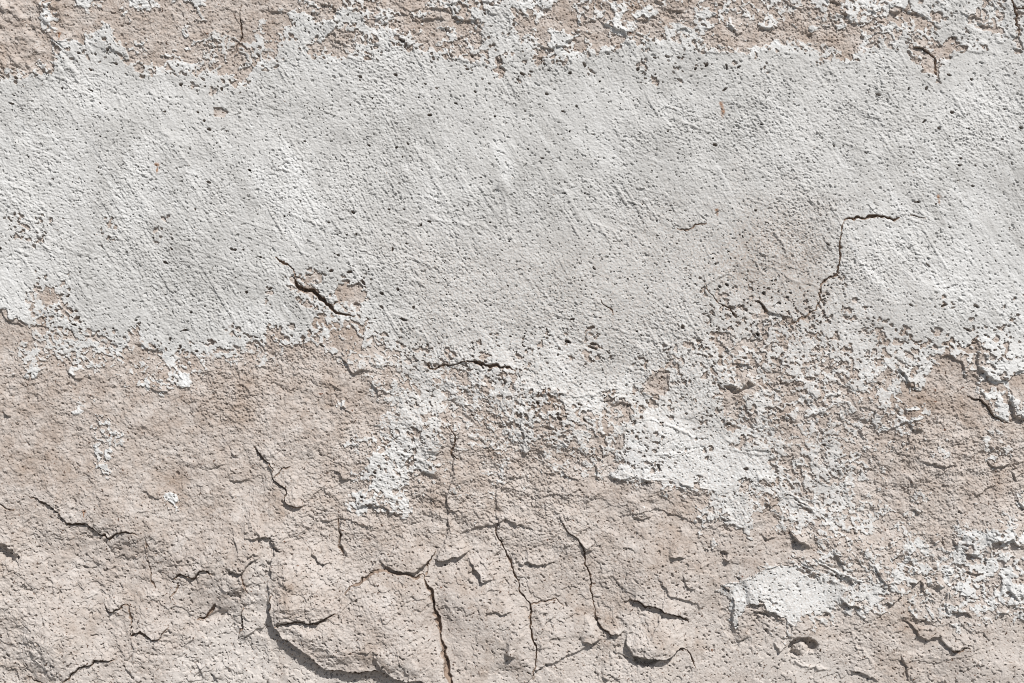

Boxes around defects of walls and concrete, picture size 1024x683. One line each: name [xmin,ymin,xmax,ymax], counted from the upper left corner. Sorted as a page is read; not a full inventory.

peeling [0,0,1024,85]
crack [275,257,356,317]
crack [790,215,926,325]
crack [427,360,516,371]
peeling [0,262,1024,659]
crack [26,659,115,683]
crack [0,496,212,598]
crack [104,604,169,641]
crack [238,551,453,683]
crack [495,525,564,680]
crack [562,523,613,637]
spalling [633,657,662,666]